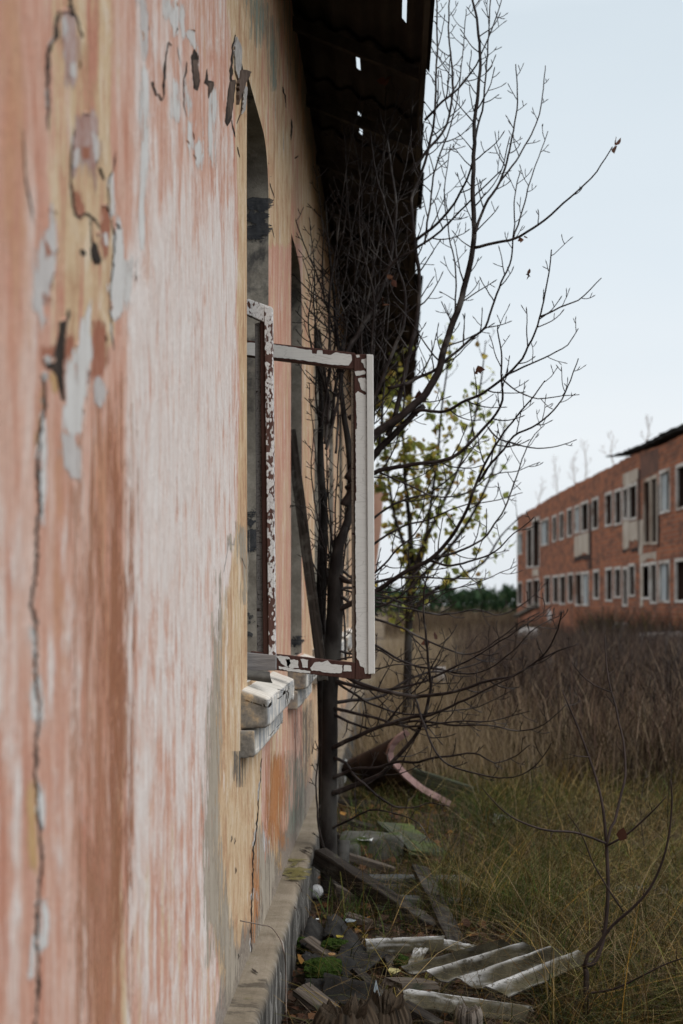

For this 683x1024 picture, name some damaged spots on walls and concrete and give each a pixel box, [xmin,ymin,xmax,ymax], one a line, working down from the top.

peeling [32,0,248,482]
peeling [247,342,255,356]
peeling [274,344,368,674]
crack [26,379,50,1024]
crack [249,759,262,973]